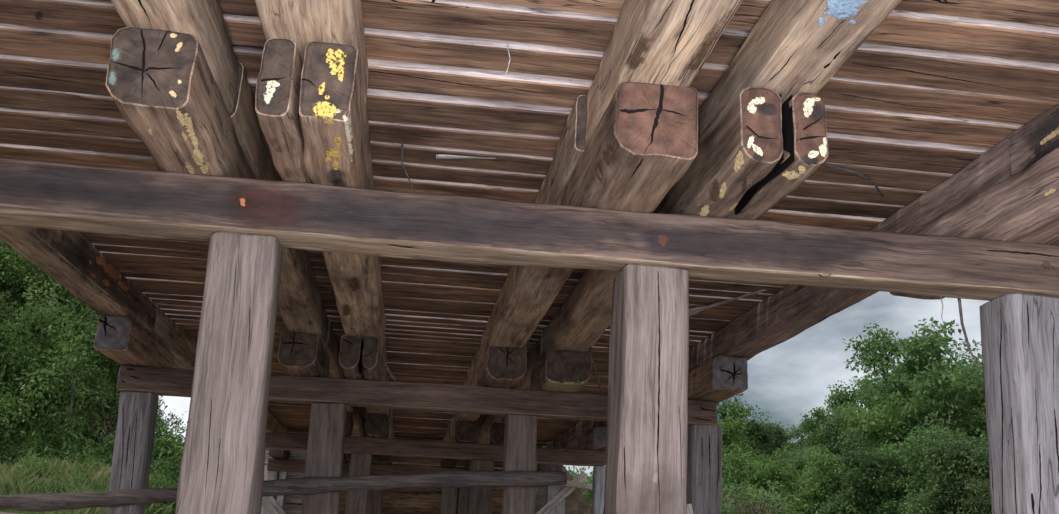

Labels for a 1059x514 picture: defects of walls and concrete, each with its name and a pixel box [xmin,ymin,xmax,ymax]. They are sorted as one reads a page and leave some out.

crack [114,0,180,100]
crack [620,0,694,181]
crack [735,19,1030,215]
crack [657,274,719,511]
crack [720,363,745,385]